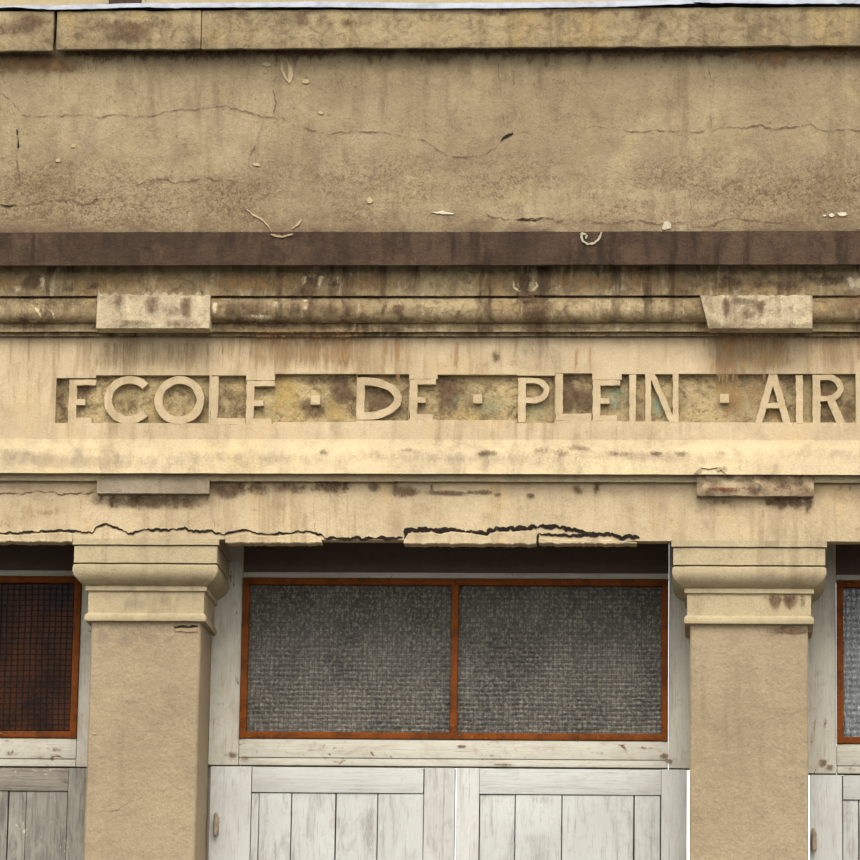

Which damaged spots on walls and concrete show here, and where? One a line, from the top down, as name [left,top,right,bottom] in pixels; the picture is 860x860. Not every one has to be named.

crack [599,116,860,133]
crack [16,90,513,180]
crack [138,177,240,185]
crack [0,196,119,207]
crack [482,214,782,227]
leakage [95,495,199,508]
crack [0,510,640,544]
spalling [404,530,637,548]